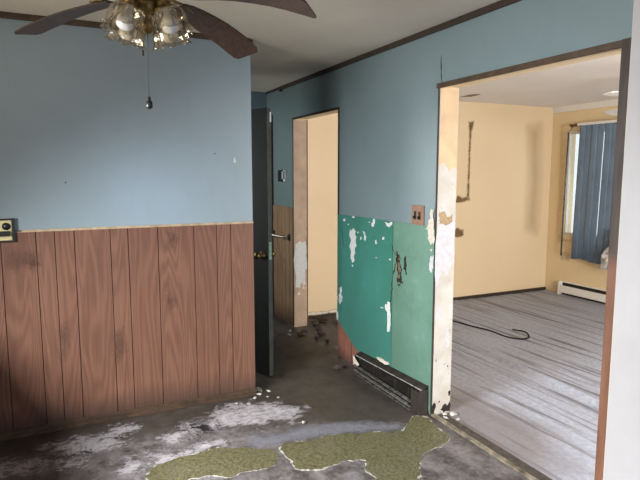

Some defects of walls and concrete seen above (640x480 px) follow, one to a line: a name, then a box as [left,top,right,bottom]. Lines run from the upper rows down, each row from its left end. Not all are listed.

peeling [294,241,307,295]
peeling [343,216,366,267]
peeling [426,209,455,286]
peeling [381,302,391,332]
spalling [432,390,460,420]
leakage [0,422,143,480]
leakage [110,398,399,478]